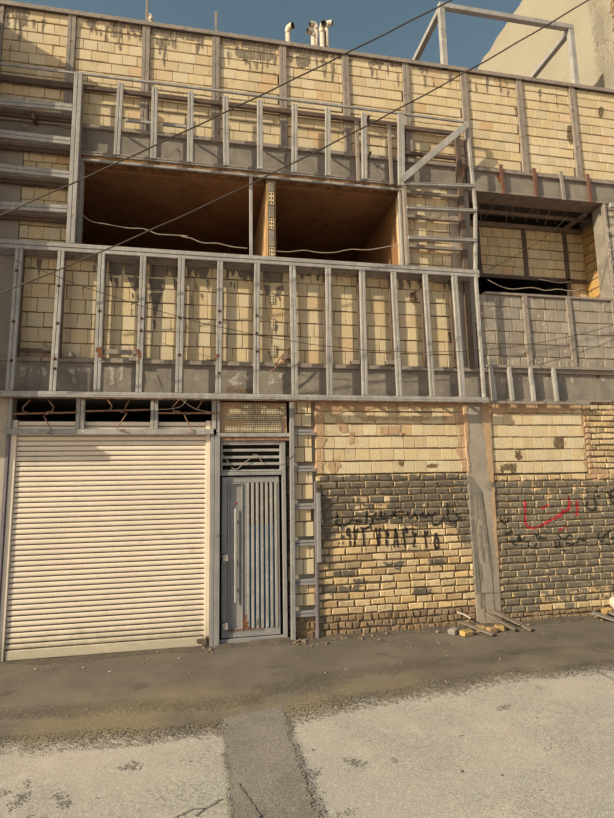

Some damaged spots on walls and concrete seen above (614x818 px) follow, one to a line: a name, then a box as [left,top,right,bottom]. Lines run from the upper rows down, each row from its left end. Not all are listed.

leakage [5,5,46,52]
leakage [80,18,205,66]
leakage [220,37,353,83]
leakage [368,60,402,88]
leakage [109,262,210,330]
spalling [499,450,523,476]
spalling [553,437,566,449]